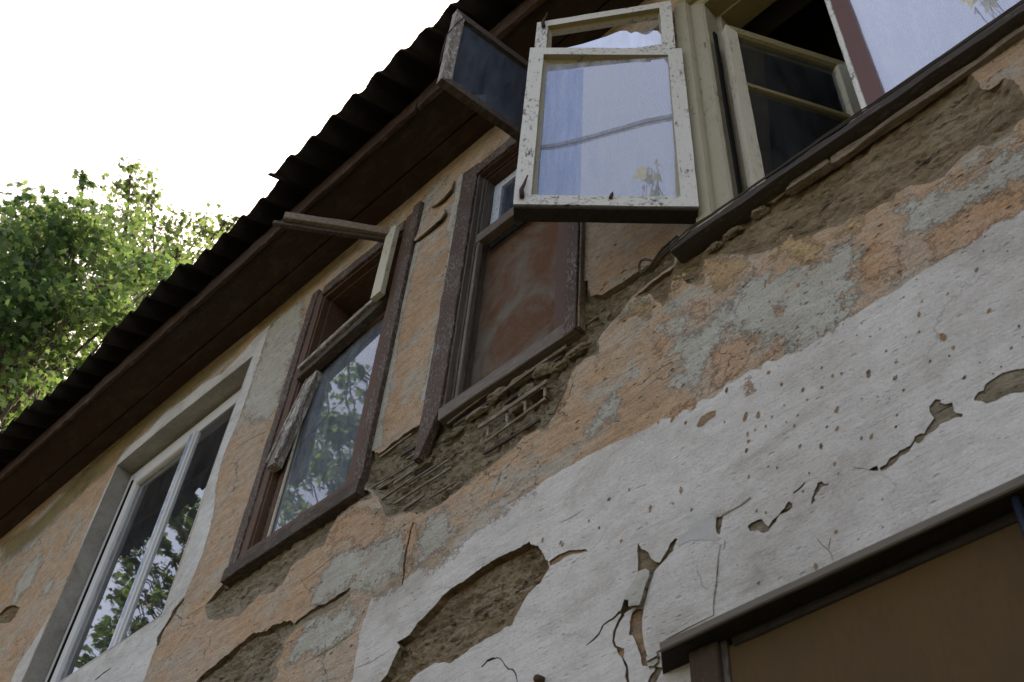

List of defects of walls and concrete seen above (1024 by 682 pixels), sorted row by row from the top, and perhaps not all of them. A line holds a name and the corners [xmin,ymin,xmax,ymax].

spalling [197,74,1024,682]
peeling [0,471,89,623]
crack [402,523,414,585]
crack [637,538,677,580]
crack [482,657,518,682]
crack [586,599,644,682]